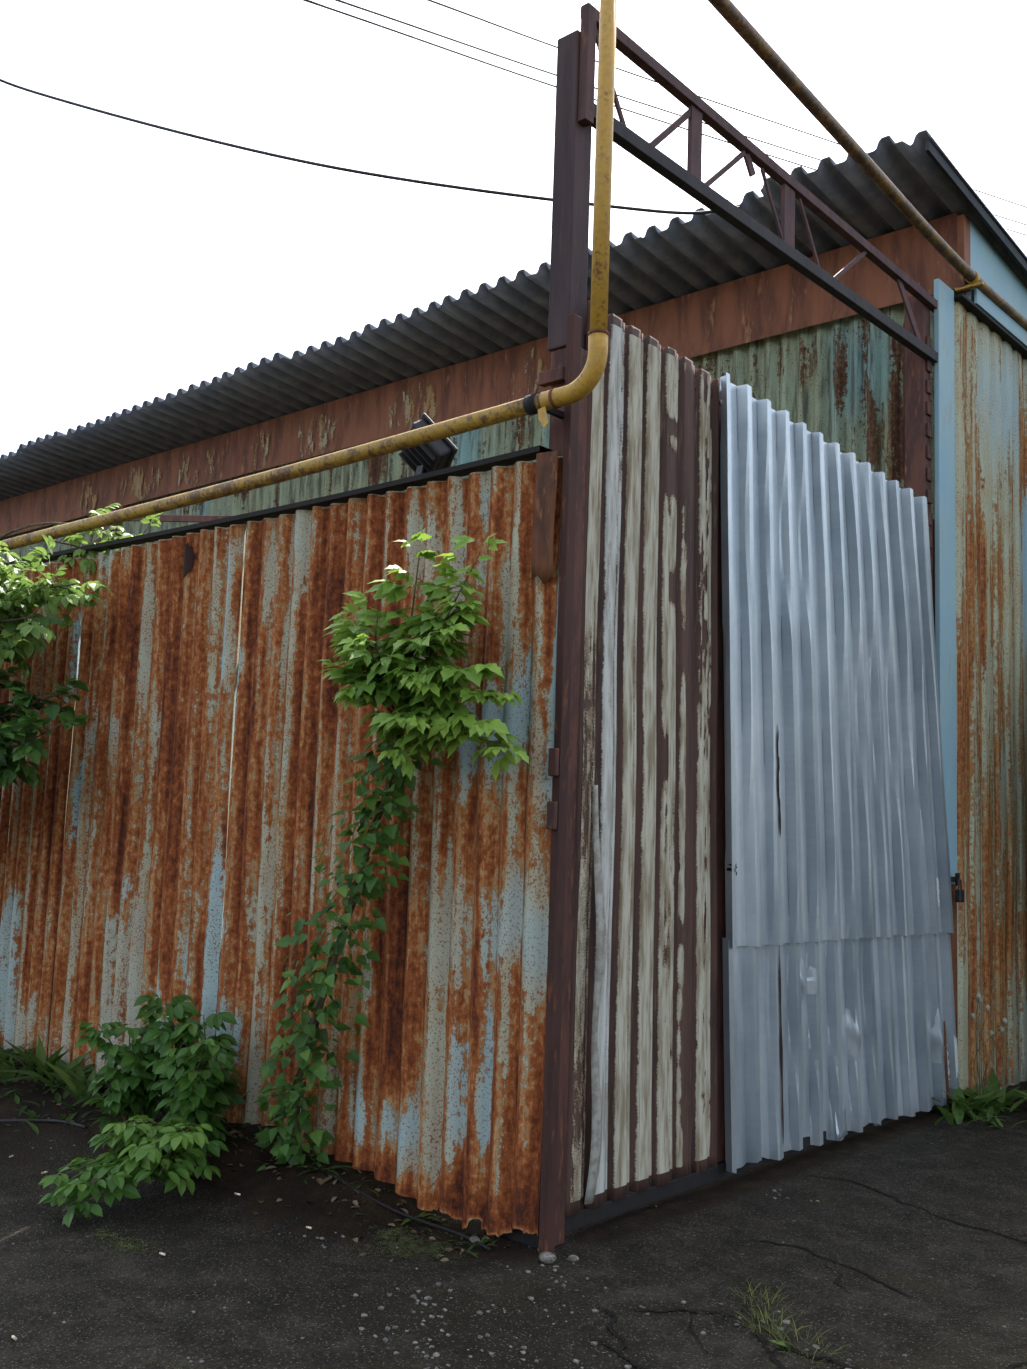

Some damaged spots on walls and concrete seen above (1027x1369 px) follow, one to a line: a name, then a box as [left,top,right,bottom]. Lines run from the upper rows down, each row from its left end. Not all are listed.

rust [697,311,905,488]
rust [0,415,563,1237]
peeling [570,324,712,1203]
rust [955,307,1027,1090]
crack [598,1300,859,1369]
crack [730,1225,916,1298]
crack [804,1174,1027,1243]